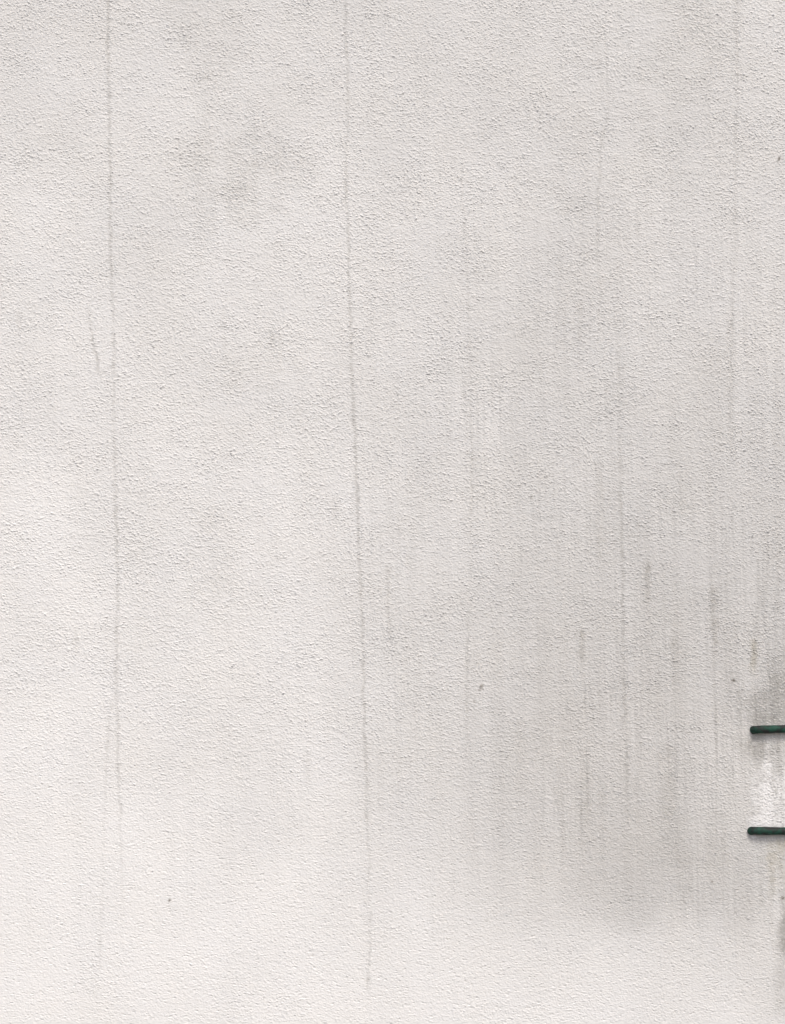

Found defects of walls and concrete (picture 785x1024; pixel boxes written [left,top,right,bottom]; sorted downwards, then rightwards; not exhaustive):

water stain [745,740,785,839]